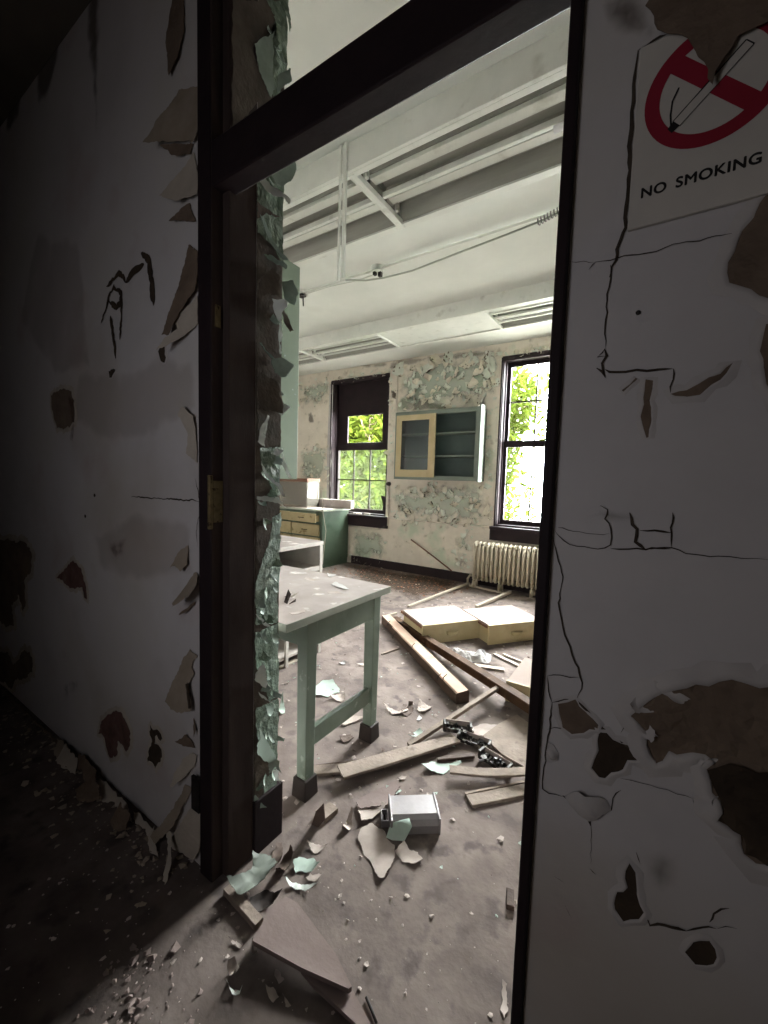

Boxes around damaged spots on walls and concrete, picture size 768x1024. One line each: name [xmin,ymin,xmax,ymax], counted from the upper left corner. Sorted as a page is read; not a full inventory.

peeling [231,0,292,126]
peeling [645,0,768,85]
peeling [143,86,198,222]
crack [575,34,732,392]
peeling [156,245,198,366]
peeling [619,195,768,440]
peeling [253,162,551,808]
crack [542,505,768,799]
peeling [96,779,200,884]
crack [588,778,693,874]
flaking render [553,660,768,887]
crack [647,908,737,931]